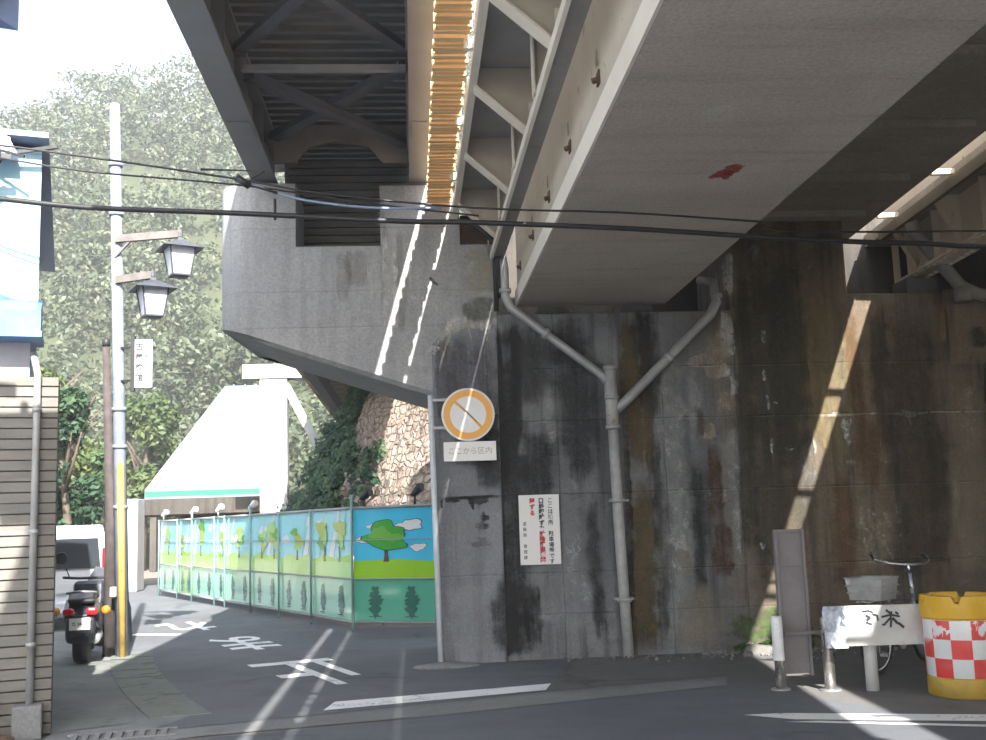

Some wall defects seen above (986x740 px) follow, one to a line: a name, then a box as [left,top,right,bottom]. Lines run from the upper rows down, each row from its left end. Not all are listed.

leakage [435,321,599,655]
leakage [585,511,605,636]
leakage [735,266,808,573]